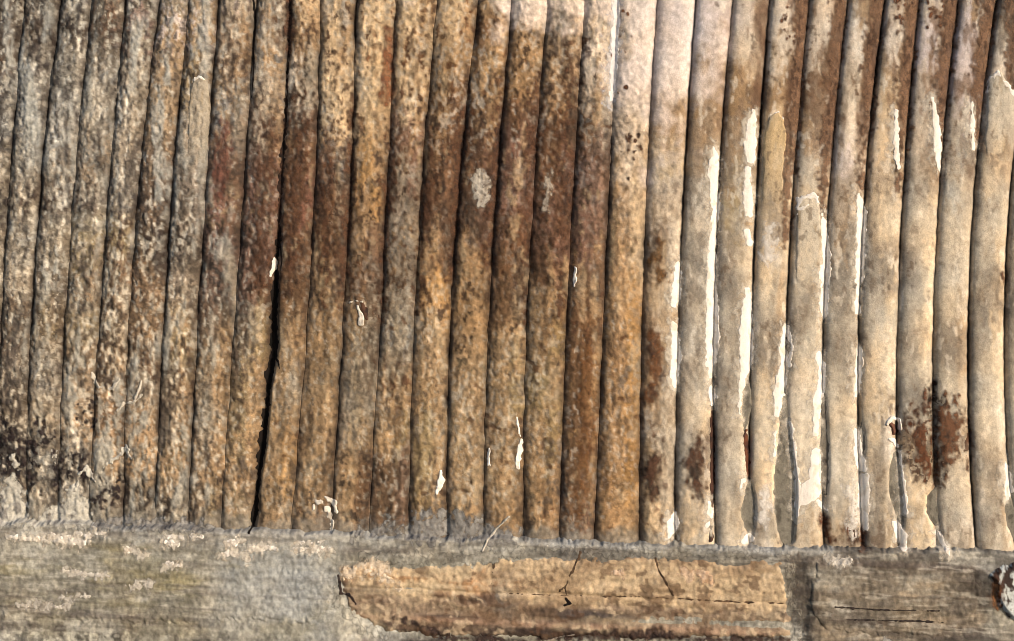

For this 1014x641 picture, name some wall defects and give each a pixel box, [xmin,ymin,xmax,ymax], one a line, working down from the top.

flaking render [738,109,787,247]
spalling [923,93,947,172]
flaking render [962,70,1014,162]
leakage [0,416,125,510]
leakage [76,394,98,428]
crack [247,38,290,534]
spalling [664,256,686,391]
spalling [700,146,724,542]
spalling [729,286,758,549]
spalling [768,321,831,545]
flaking render [795,192,833,321]
corrosion [895,380,971,489]